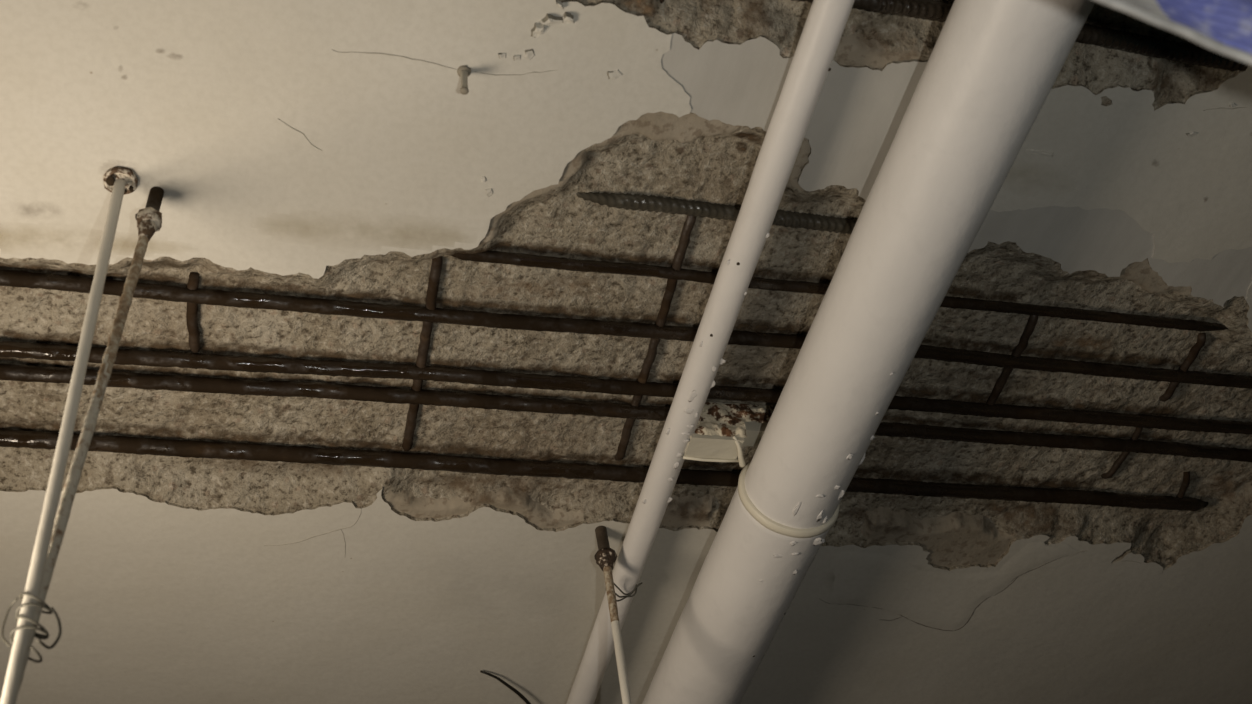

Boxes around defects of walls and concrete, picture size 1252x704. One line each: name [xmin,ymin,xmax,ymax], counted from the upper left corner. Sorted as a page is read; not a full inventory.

spalling [1052,2,1249,111]
rust [106,175,135,194]
rust [0,264,183,284]
spalling [0,0,813,532]
rust [448,242,720,272]
spalling [659,0,955,532]
rust [203,279,697,327]
rust [119,342,681,383]
spalling [821,241,1252,572]
rust [94,425,648,466]
rust [682,461,746,471]
crack [819,551,1084,631]